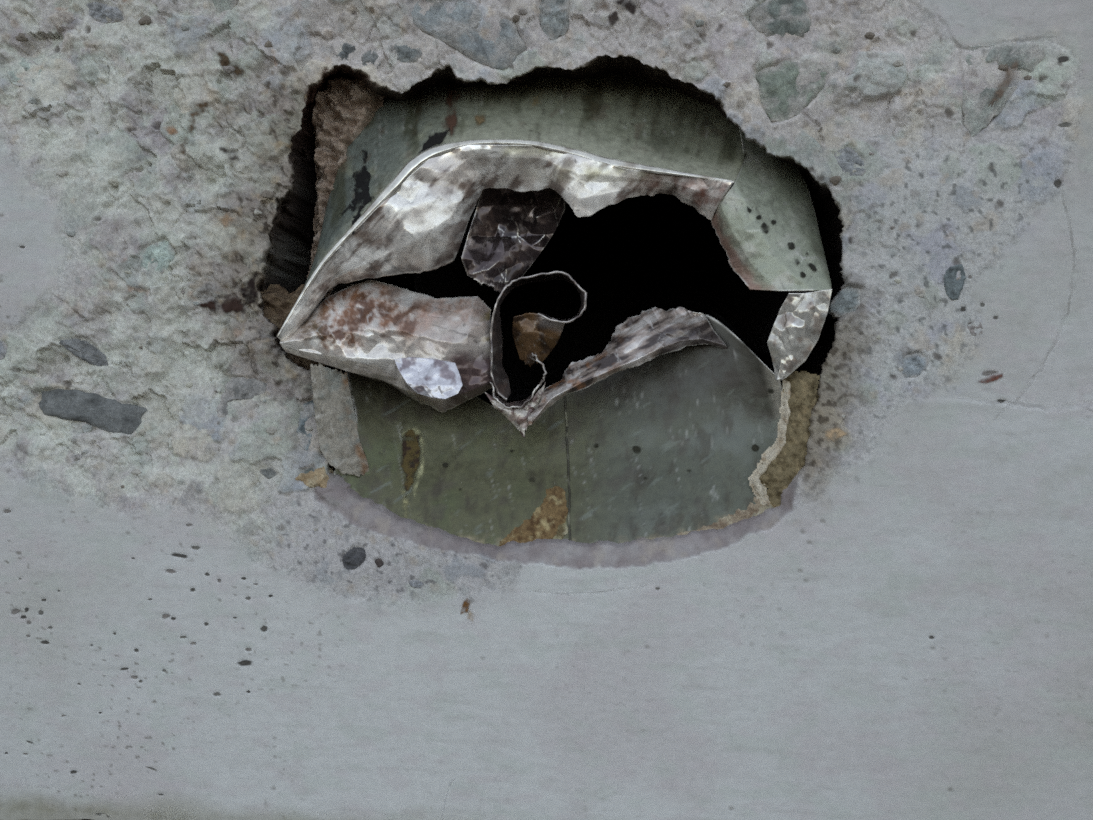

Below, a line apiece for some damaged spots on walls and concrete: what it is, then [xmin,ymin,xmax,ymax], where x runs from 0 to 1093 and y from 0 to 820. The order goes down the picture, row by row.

corrosion [401,428,424,504]
spalling [0,0,1086,609]